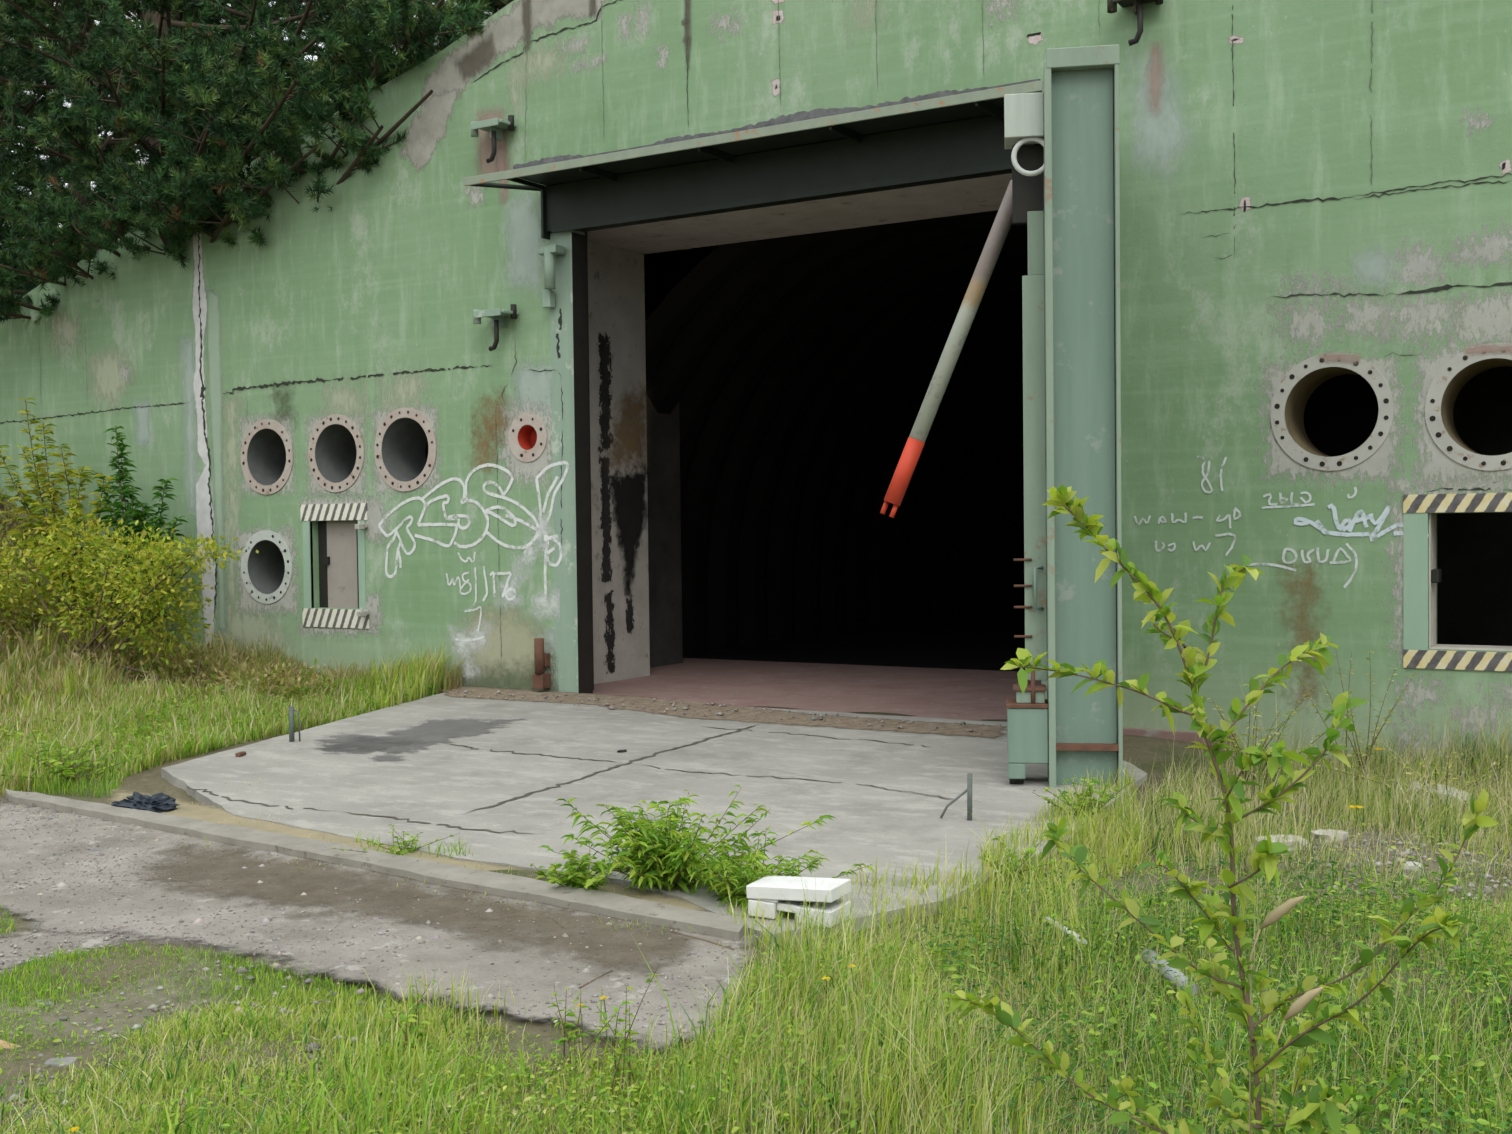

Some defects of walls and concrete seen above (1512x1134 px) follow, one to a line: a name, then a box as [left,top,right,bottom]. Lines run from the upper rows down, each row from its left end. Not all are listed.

crack [474,0,621,82]
crack [1185,173,1512,259]
crack [1268,282,1512,298]
crack [0,230,563,621]
damp [610,394,648,597]